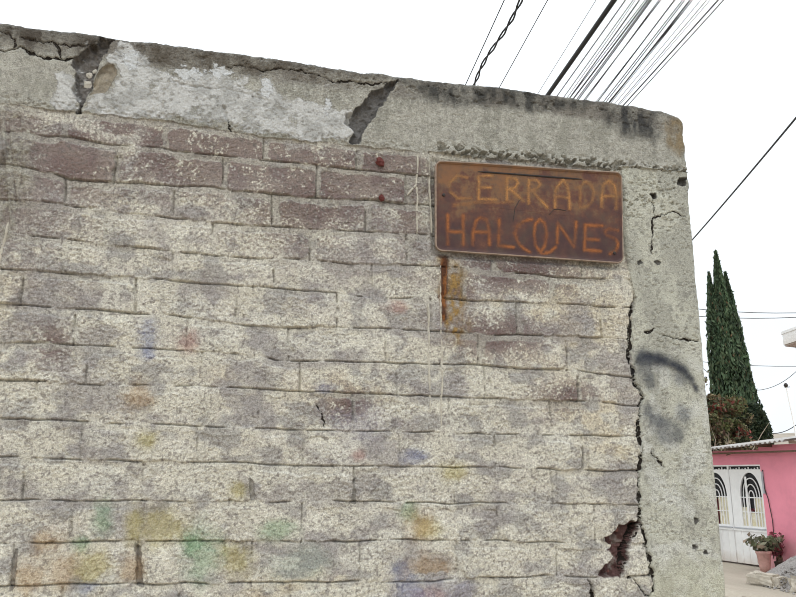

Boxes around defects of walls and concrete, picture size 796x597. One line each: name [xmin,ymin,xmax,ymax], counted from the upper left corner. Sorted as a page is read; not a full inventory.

crack [0,31,82,62]
crack [651,202,681,254]
rust [439,256,463,337]